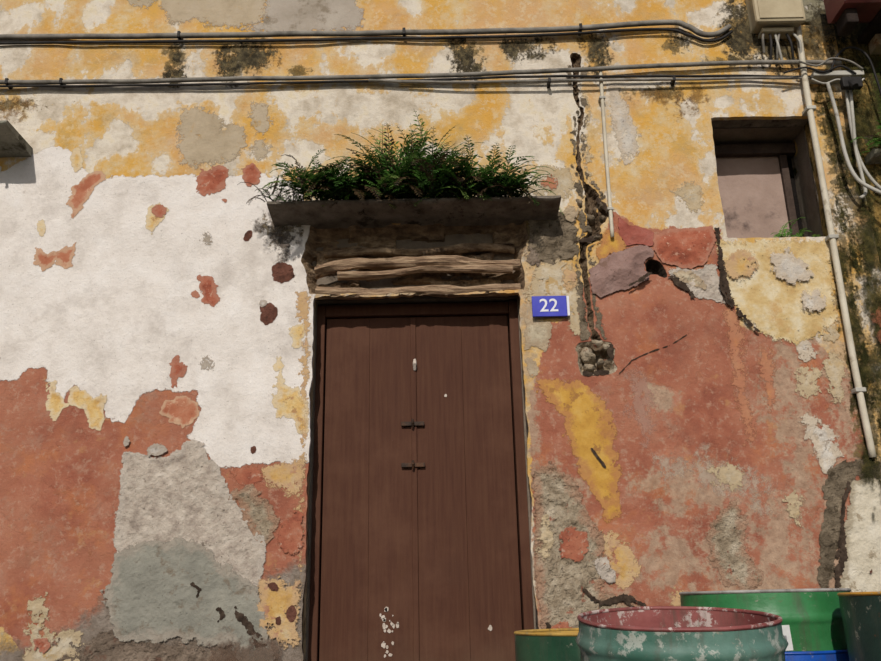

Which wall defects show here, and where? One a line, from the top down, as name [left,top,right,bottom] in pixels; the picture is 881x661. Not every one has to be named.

water stain [214,38,281,88]
water stain [447,39,487,88]
water stain [498,37,555,62]
water stain [577,30,612,79]
crack [566,53,609,351]
peeling [272,262,295,283]
crack [619,334,687,374]
peeling [645,259,777,446]
flaking render [522,164,642,629]
flaking render [113,291,311,650]
crack [834,481,852,588]
crack [582,588,646,607]